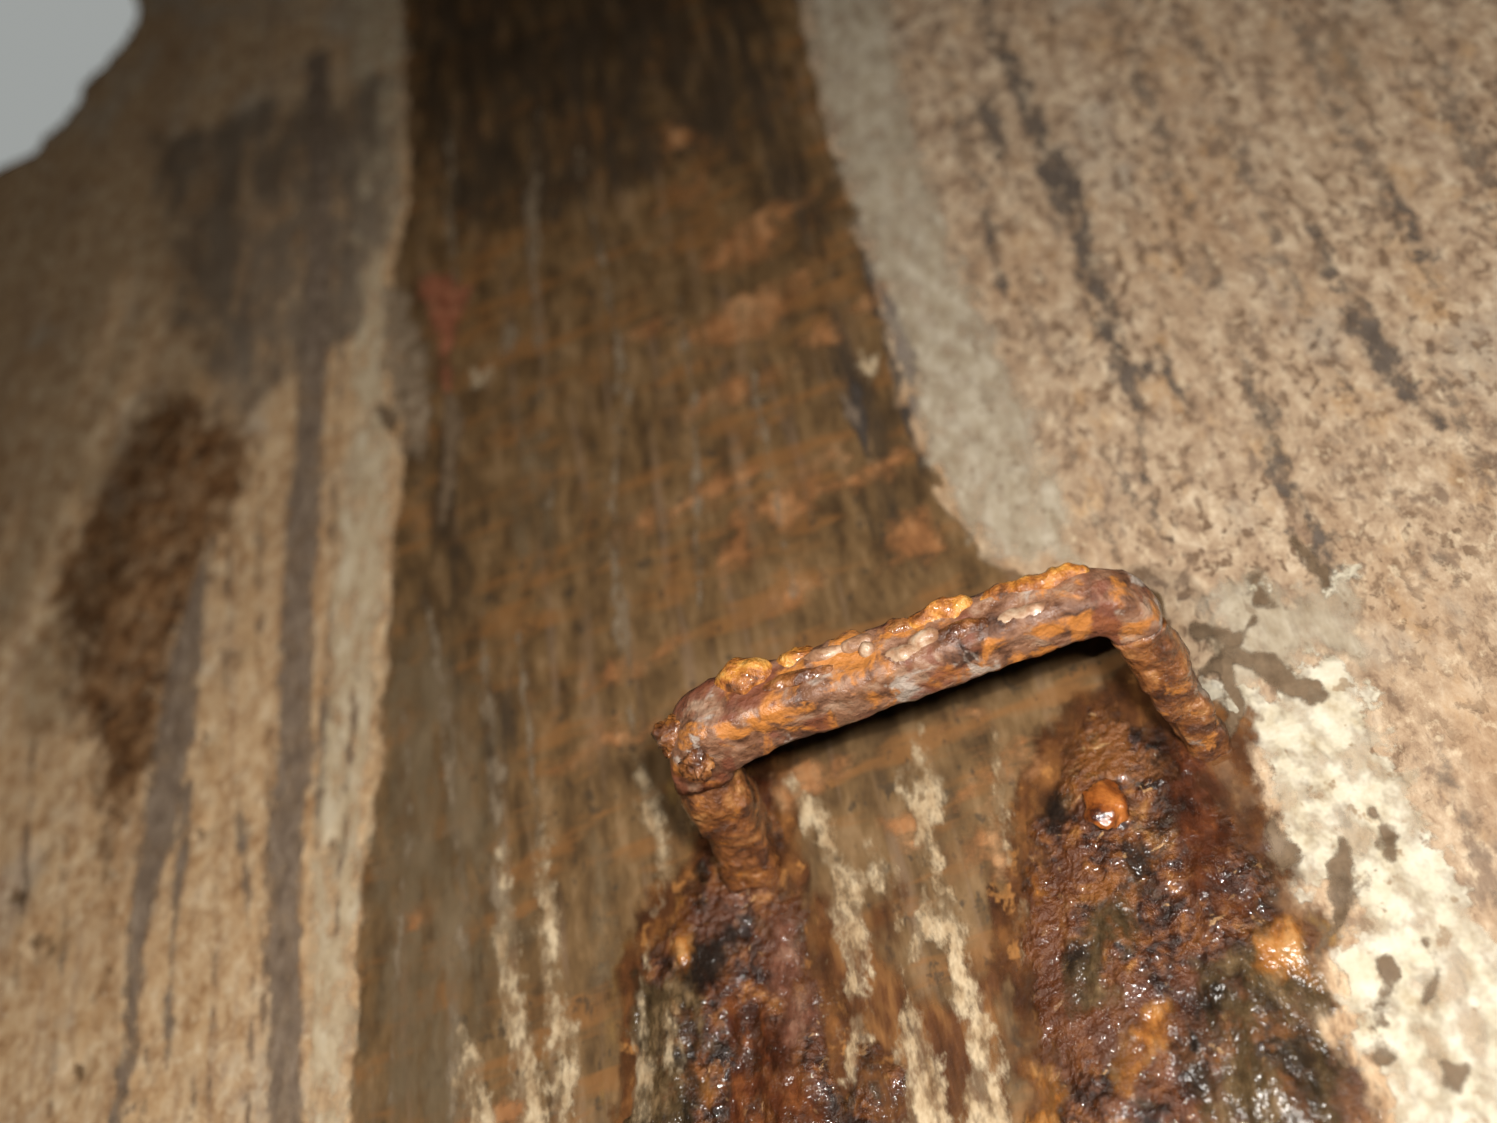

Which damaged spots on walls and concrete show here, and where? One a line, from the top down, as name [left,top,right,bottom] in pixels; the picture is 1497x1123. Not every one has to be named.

water stain [980,0,1184,429]
water stain [109,537,231,1123]
water stain [237,814,251,897]
rust [611,830,710,1123]
water stain [248,0,1138,1123]
rust [714,562,1089,695]
rust [744,664,1184,1123]
rust [1177,674,1379,1123]